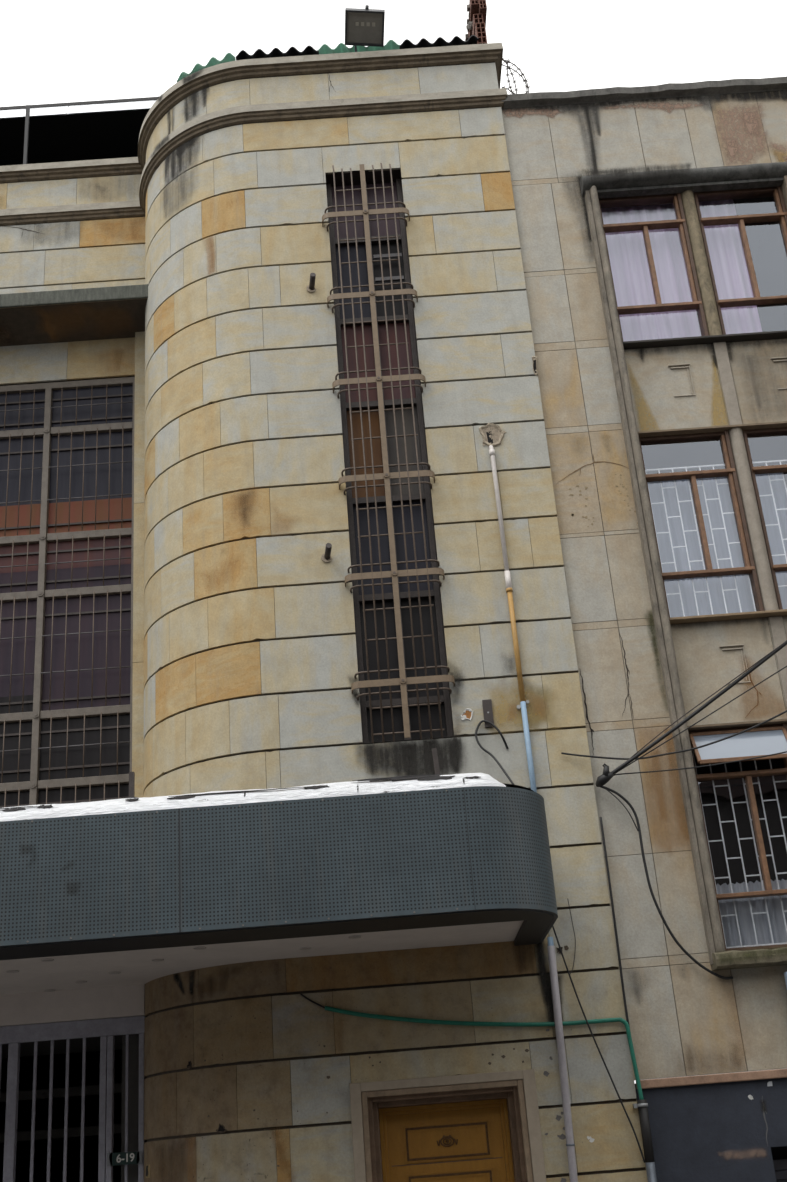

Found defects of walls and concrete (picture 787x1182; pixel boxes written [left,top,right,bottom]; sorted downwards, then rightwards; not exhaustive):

water stain [183,69,207,120]
water stain [152,110,199,181]
crack [580,670,594,755]
crack [618,629,634,719]